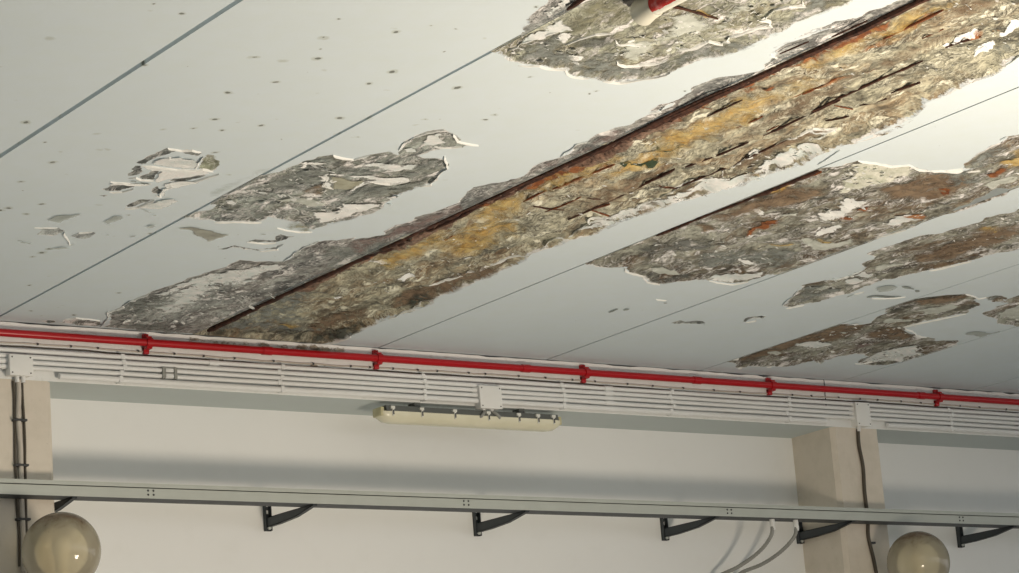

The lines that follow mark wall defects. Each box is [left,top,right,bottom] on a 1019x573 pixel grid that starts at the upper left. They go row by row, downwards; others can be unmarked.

spalling [34,0,1019,345]
peeling [727,294,1019,369]